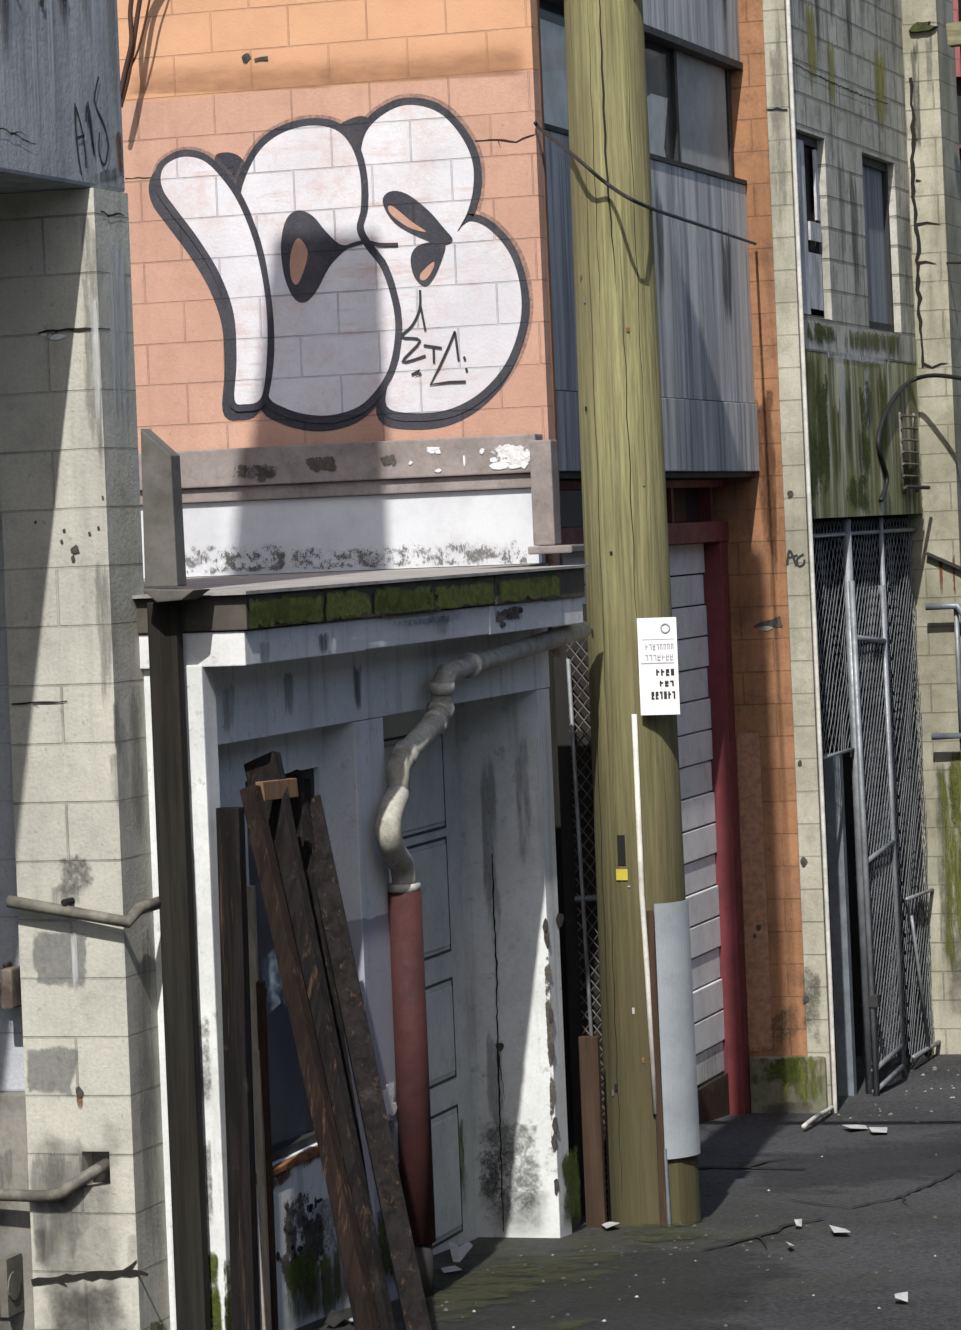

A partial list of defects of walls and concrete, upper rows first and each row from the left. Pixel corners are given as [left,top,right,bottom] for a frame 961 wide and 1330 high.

crack [0,128,36,145]
crack [793,62,947,368]
leakage [827,350,884,468]
peeling [427,447,442,473]
peeling [463,444,530,470]
peeling [185,541,527,573]
peeling [542,913,564,1152]
leakage [482,1125,537,1203]
crack [31,1260,149,1286]